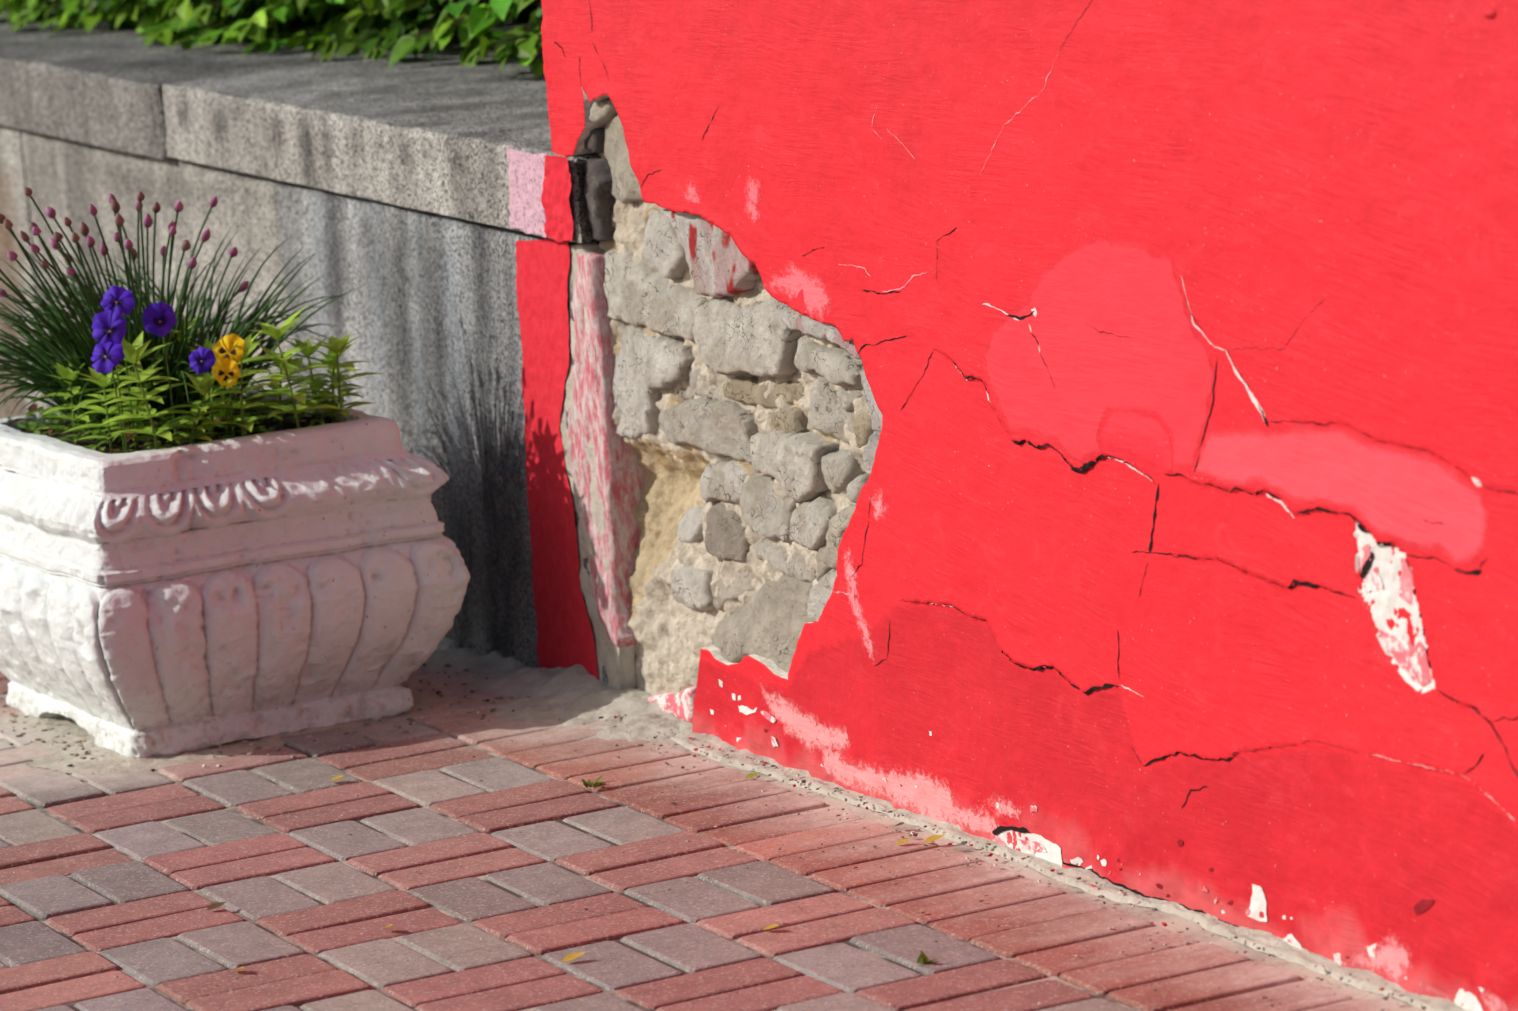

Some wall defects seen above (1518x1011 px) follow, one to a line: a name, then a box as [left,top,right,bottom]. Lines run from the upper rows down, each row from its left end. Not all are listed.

crack [980,1,1091,175]
crack [803,228,956,294]
spalling [559,99,882,723]
crack [857,276,1517,598]
crack [836,498,1143,697]
peeling [1354,519,1435,693]
peeling [719,679,778,747]
crack [1131,690,1518,821]
crack [1062,861,1239,927]
peeling [1202,867,1302,949]